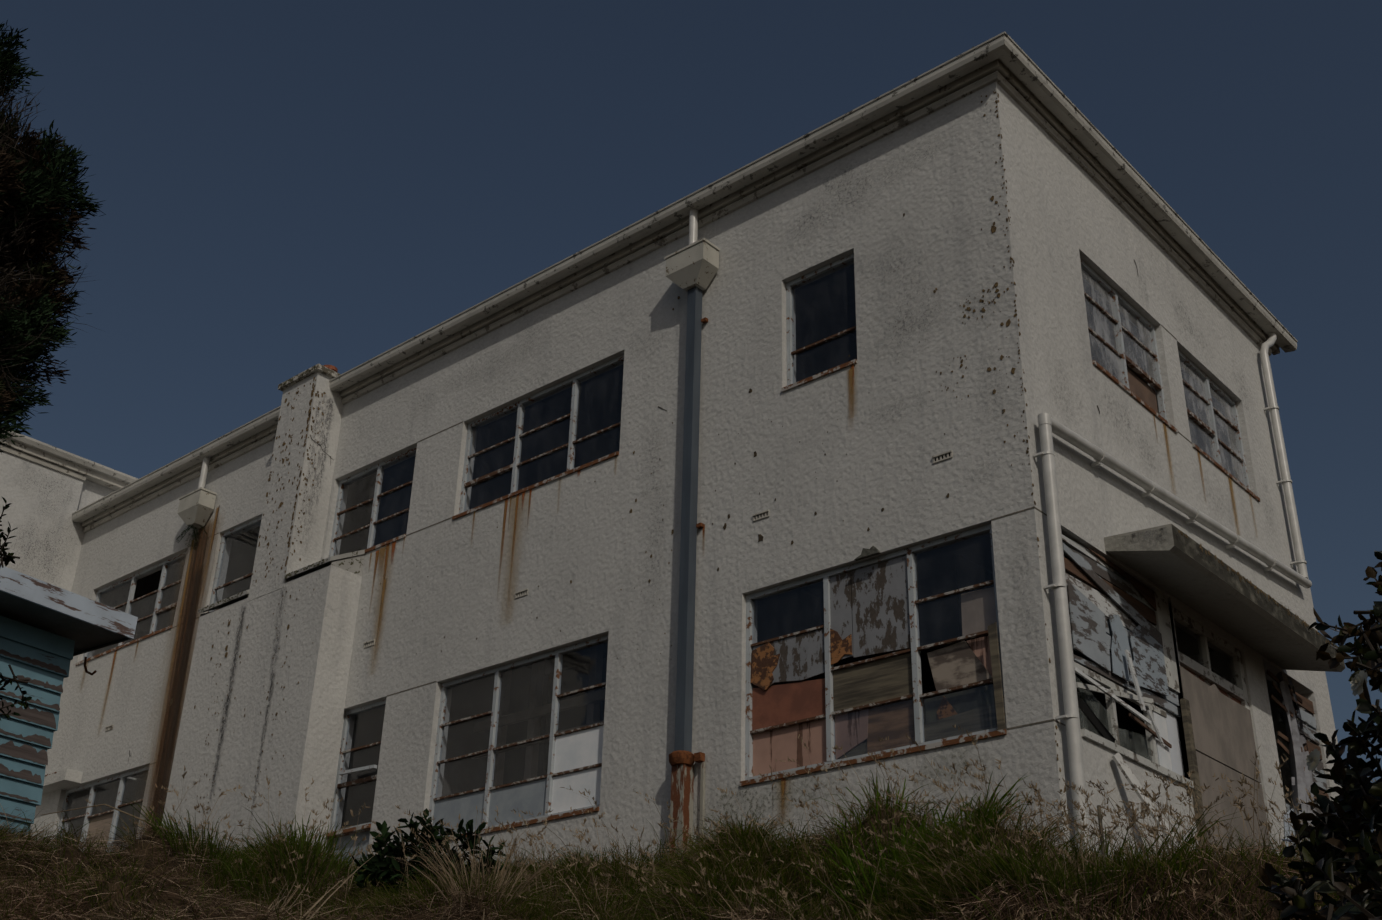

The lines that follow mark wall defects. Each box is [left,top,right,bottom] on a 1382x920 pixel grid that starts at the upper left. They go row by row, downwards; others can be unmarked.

spalling [960,91,1036,505]
spalling [252,368,332,585]
corrosion [370,537,405,616]
corrosion [501,489,532,548]
peeling [0,649,67,821]